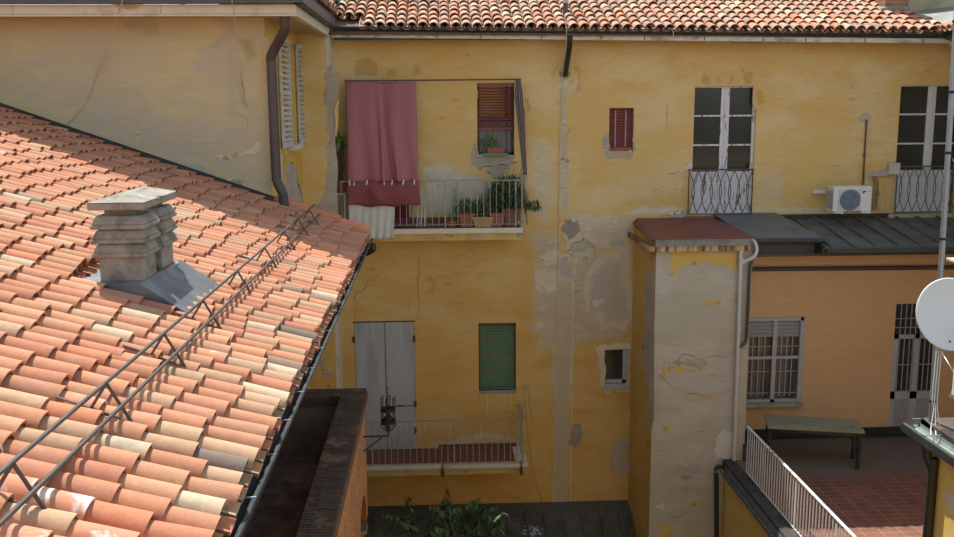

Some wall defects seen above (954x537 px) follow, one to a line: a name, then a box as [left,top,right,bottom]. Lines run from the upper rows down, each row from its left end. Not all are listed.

peeling [23,85,266,193]
peeling [280,151,304,203]
peeling [315,62,339,214]
peeling [414,122,688,298]
peeling [595,264,654,422]
flaking render [609,436,629,476]